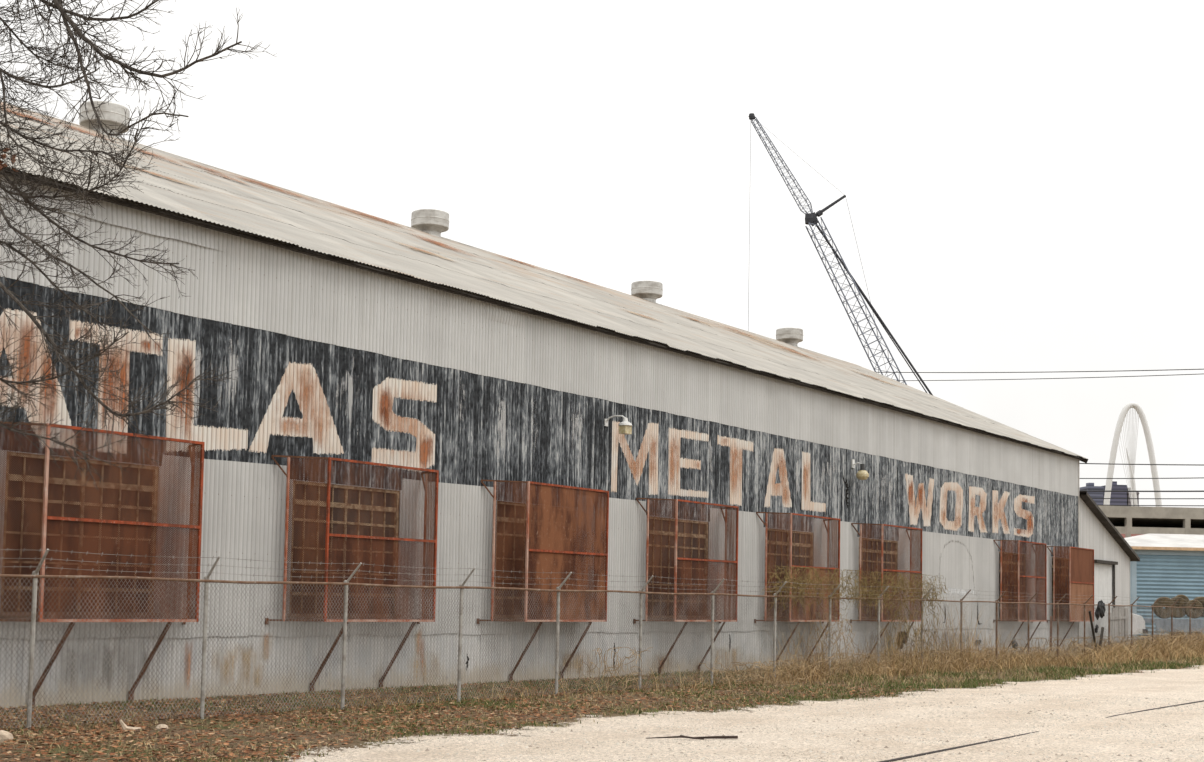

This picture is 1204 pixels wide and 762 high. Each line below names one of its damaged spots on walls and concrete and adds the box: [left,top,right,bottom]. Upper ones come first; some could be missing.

corrosion [12,330,56,411]
corrosion [179,354,192,428]
peeling [220,339,239,406]
peeling [336,358,358,435]
corrosion [380,393,432,468]
peeling [497,401,508,466]
corrosion [908,485,925,509]